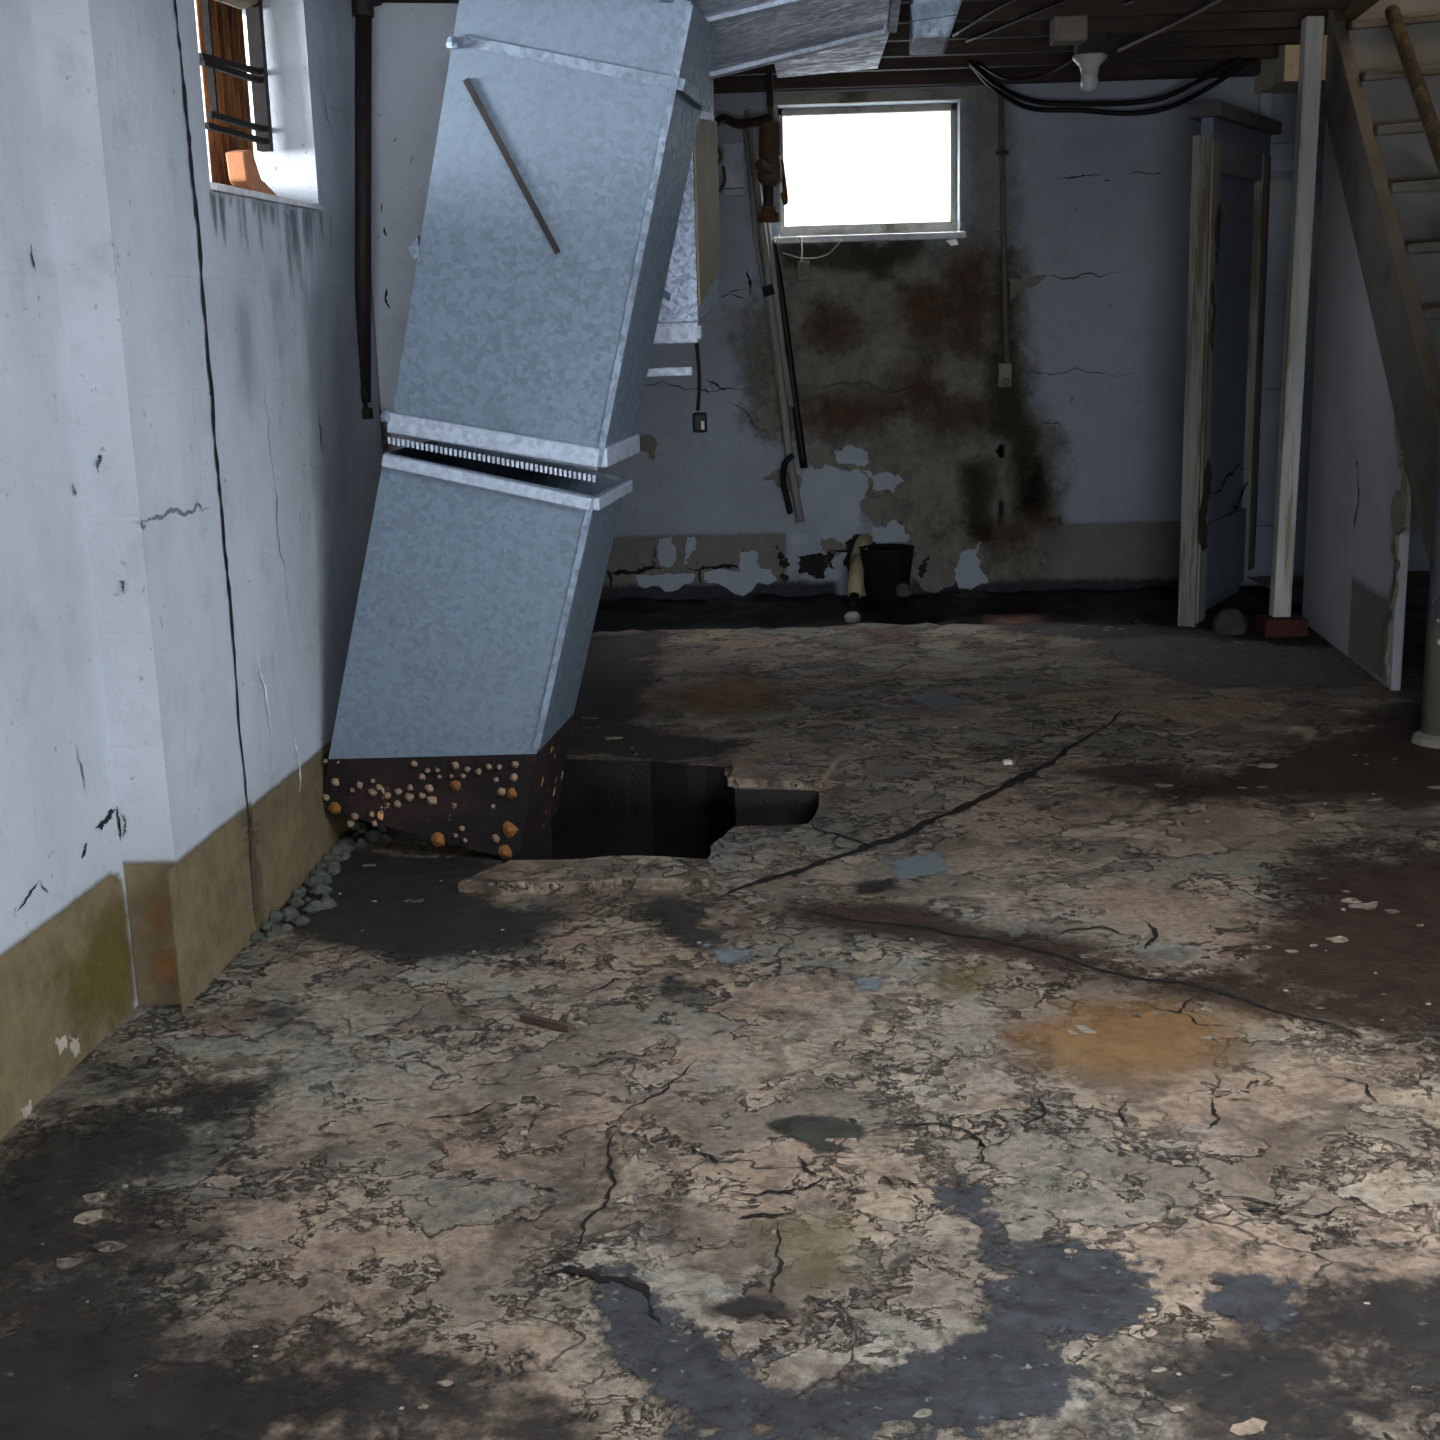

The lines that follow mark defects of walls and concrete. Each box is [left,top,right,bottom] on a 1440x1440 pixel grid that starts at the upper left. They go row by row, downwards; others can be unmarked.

water stain [741,88,1181,595]
crack [140,0,271,916]
peeling [640,434,658,463]
water stain [600,534,837,602]
peeling [635,445,989,596]
peeling [1093,418,1412,690]
corrosion [322,759,519,828]
corrosion [431,826,468,847]
corrosion [492,821,519,860]
crack [716,710,1367,1035]
water stain [789,839,1440,1031]
crack [544,1058,697,1324]